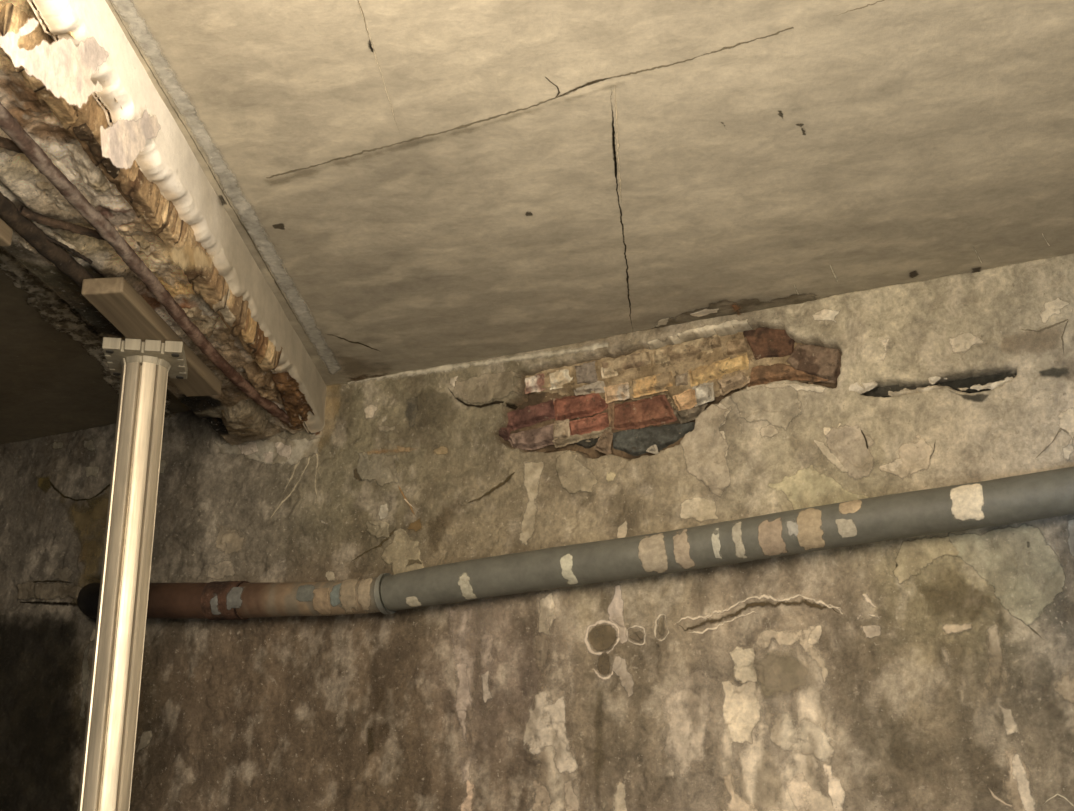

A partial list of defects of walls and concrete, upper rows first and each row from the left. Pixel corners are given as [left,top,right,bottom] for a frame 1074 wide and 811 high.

corrosion [0,3,283,371]
spalling [0,0,314,446]
crack [266,0,794,328]
flaking render [450,327,1017,510]
water stain [0,617,77,811]
crack [675,594,880,634]